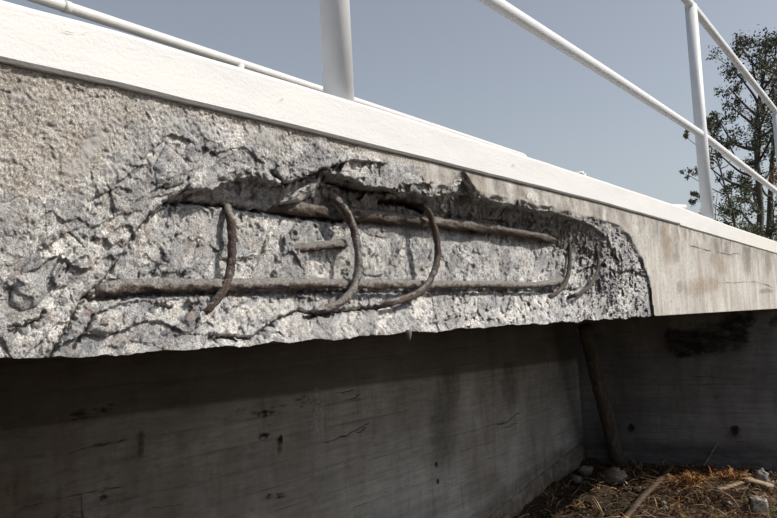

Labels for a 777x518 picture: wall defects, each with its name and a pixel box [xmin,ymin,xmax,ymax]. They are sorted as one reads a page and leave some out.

crack [274,169,417,210]
crack [53,184,288,349]
spalling [0,134,654,358]
crack [210,308,369,340]
damp [665,311,754,357]
crack [314,422,370,444]